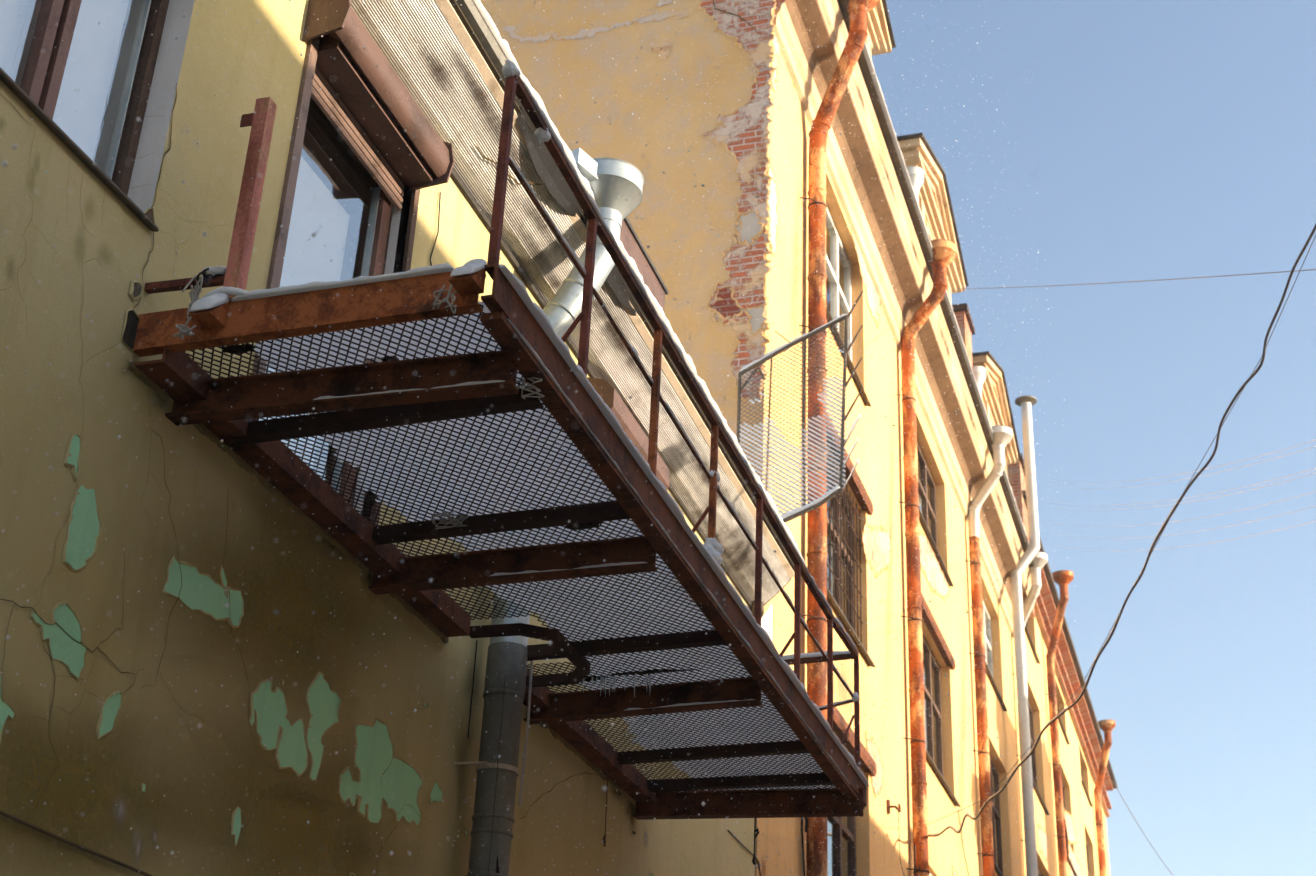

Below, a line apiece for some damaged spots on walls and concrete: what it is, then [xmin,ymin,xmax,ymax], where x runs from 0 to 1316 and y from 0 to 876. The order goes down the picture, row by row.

crack [713,0,759,34]
flaking render [503,0,780,403]
peeling [62,433,101,573]
peeling [162,556,244,628]
peeling [30,601,88,681]
crack [1,429,206,841]
peeling [0,675,15,743]
peeling [96,690,123,740]
peeling [249,671,444,828]
peeling [231,806,242,847]